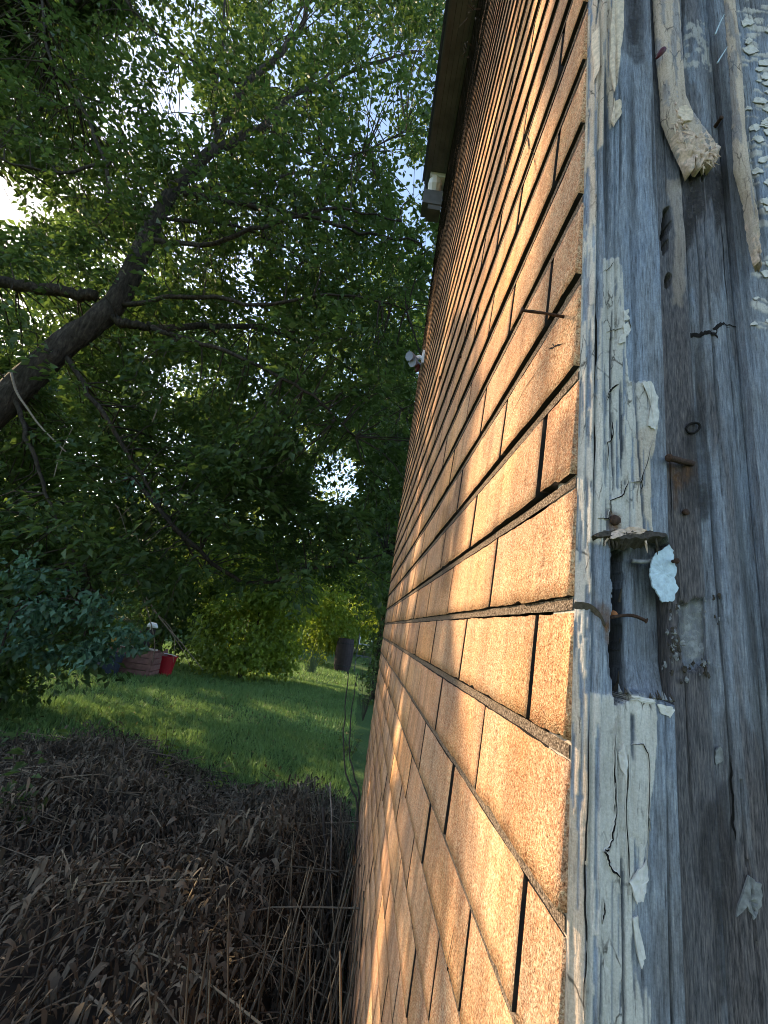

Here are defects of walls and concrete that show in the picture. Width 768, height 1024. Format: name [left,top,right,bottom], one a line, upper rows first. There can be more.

peeling [591,0,624,127]
peeling [741,17,768,143]
peeling [677,105,694,124]
peeling [751,155,768,211]
peeling [618,309,631,344]
peeling [641,381,659,430]
peeling [649,544,711,684]
peeling [617,742,628,784]
crack [583,717,651,1019]
peeling [629,859,649,969]
peeling [735,875,763,920]